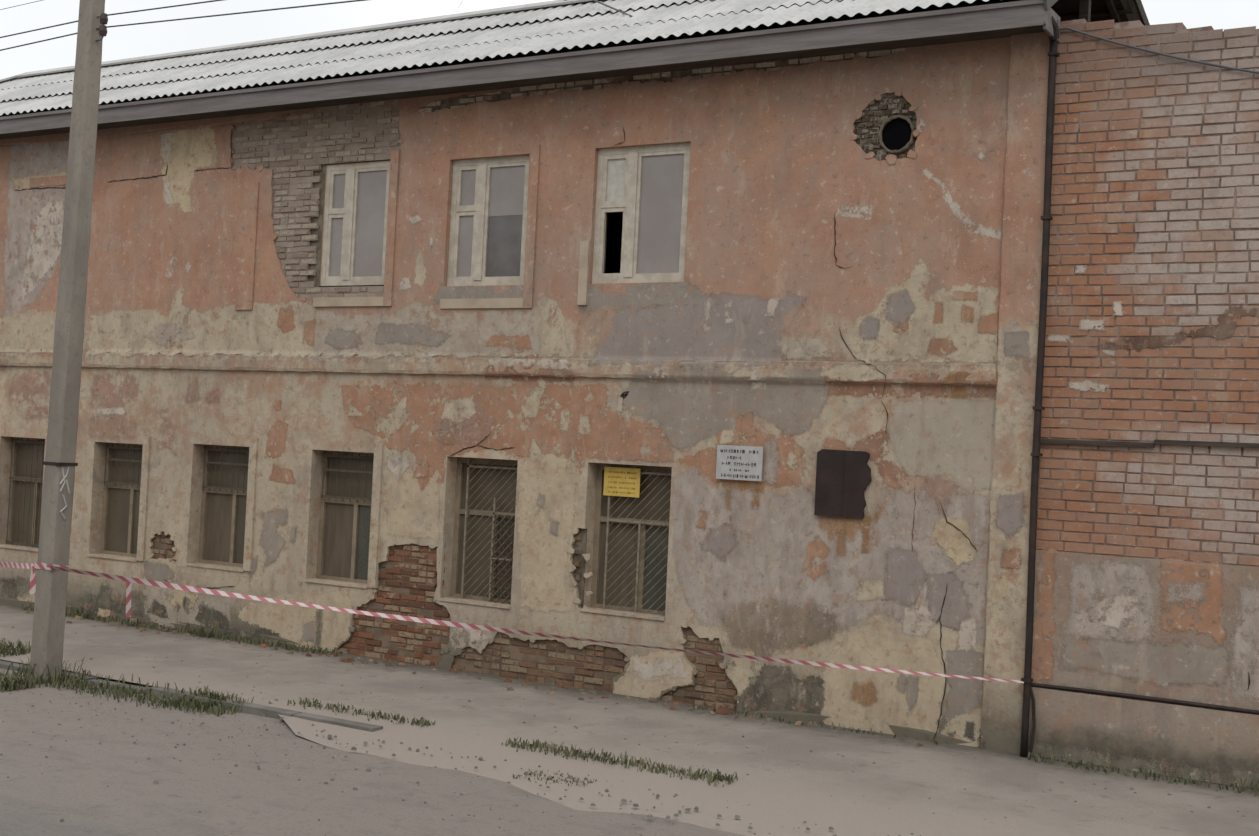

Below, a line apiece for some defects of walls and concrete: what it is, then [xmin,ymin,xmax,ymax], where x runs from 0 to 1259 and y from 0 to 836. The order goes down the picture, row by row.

peeling [0,141,69,421]
peeling [81,48,1259,749]
crack [839,327,888,427]
crack [911,491,977,551]
crack [933,588,951,741]